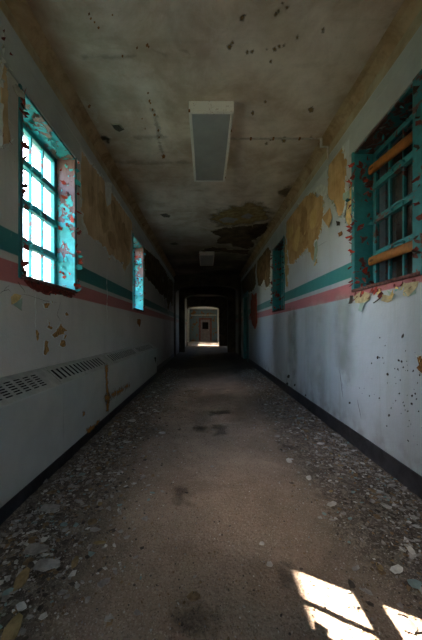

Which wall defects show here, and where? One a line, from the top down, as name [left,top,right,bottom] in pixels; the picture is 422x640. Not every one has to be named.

peeling [58,152,169,310]
peeling [200,223,268,255]
peeling [241,146,372,329]
peeling [21,257,75,309]
peeling [348,263,419,312]